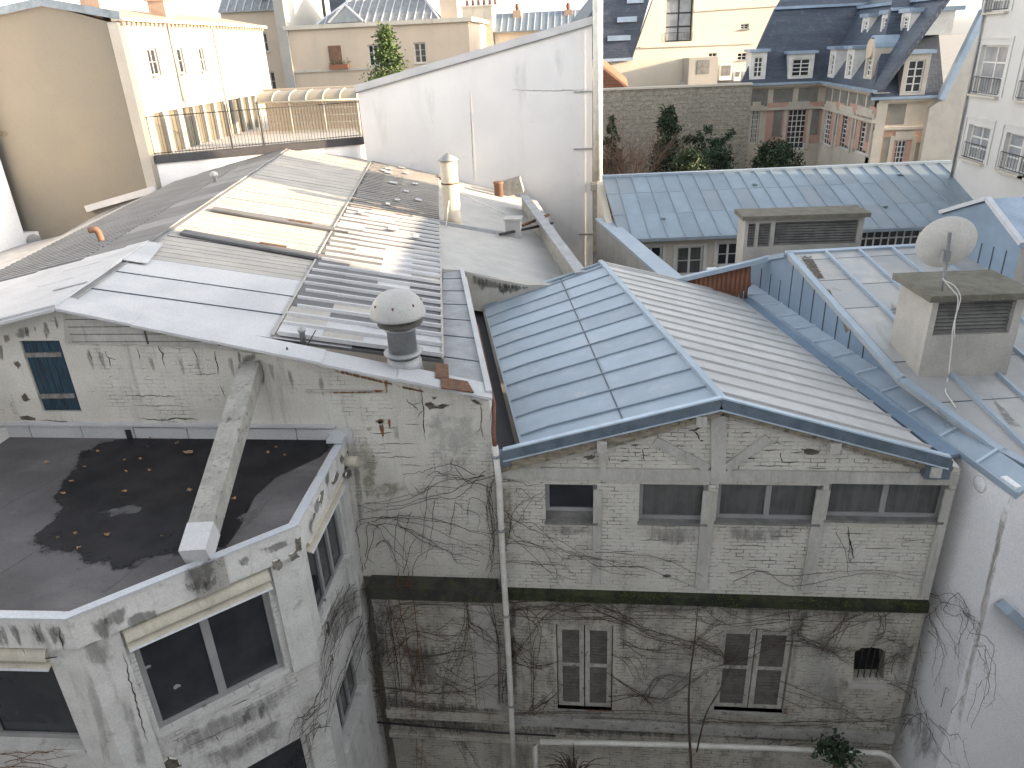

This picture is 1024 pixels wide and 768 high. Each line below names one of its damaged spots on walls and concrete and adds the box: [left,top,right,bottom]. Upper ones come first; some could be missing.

crack [89,346,226,398]
corrosion [334,370,423,393]
flaking render [425,396,450,410]
peeling [272,536,302,571]
crack [841,529,922,563]
crack [123,655,148,741]